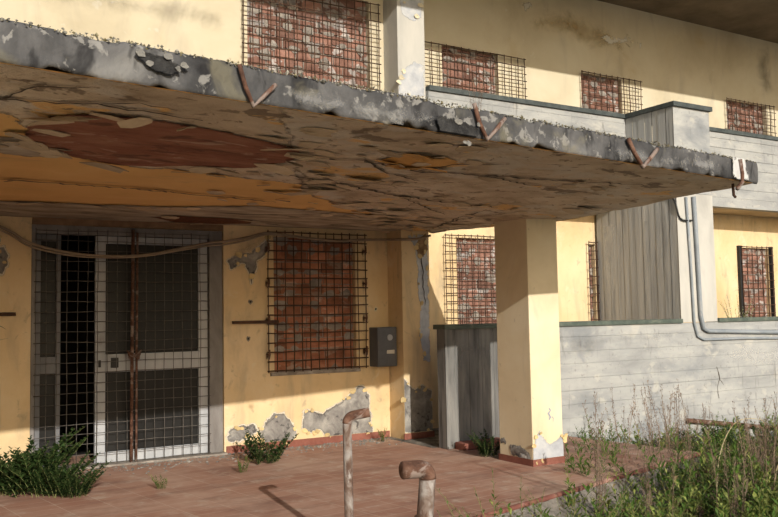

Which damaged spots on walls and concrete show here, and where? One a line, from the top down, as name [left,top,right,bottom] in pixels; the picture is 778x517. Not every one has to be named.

spalling [135,48,189,74]
peeling [0,61,753,362]
crack [333,160,645,231]
peeling [225,385,374,449]
peeling [401,378,435,433]
peeling [500,431,568,465]